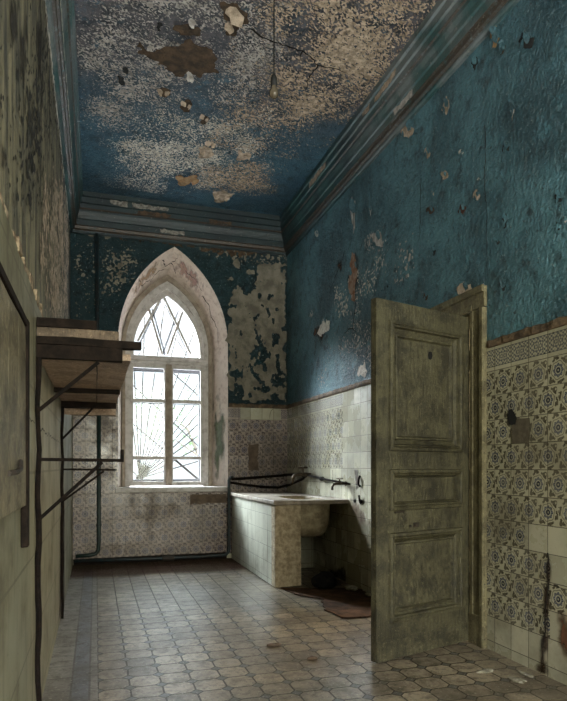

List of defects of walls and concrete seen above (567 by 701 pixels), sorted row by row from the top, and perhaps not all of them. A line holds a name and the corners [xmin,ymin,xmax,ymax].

damp [10,0,42,89]
peeling [0,0,154,318]
peeling [110,200,169,211]
peeling [76,0,436,203]
crack [251,28,345,89]
peeling [163,243,287,403]
peeling [316,226,388,386]
peeling [507,409,530,444]